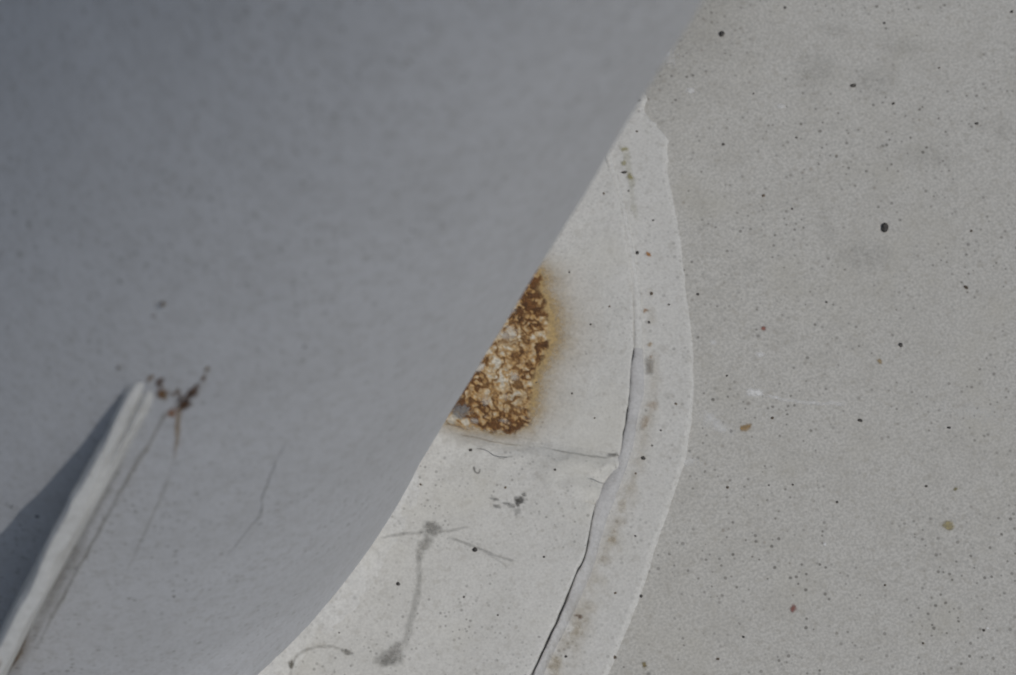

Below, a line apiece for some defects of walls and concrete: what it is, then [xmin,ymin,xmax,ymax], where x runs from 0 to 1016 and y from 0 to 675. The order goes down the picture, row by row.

rust [147,367,209,432]
rust [446,267,563,435]